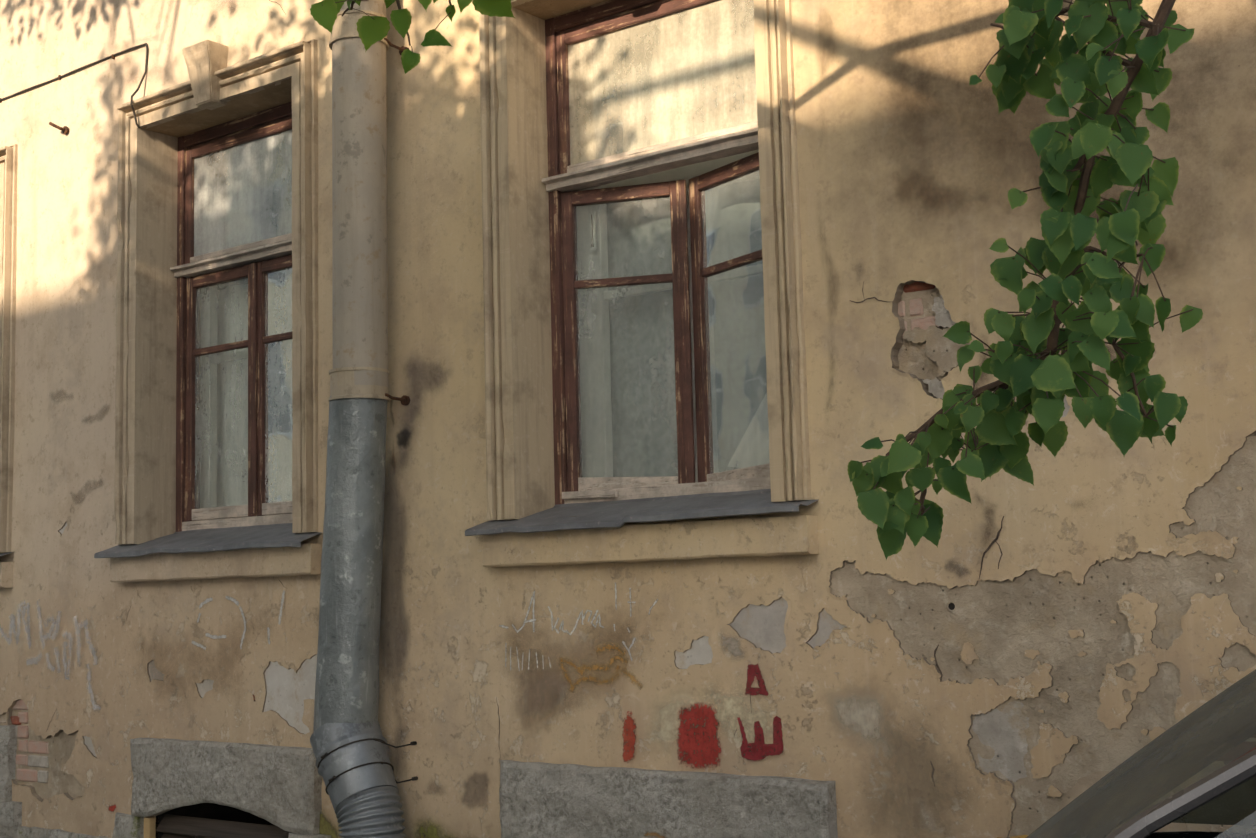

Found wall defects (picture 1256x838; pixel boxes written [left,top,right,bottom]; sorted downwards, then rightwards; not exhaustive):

spalling [888,276,973,403]
flaking render [1059,395,1073,421]
crack [979,516,1004,579]
flaking render [261,652,317,737]
flaking render [672,632,716,672]
flaking render [725,424,1256,838]
spalling [0,697,99,804]